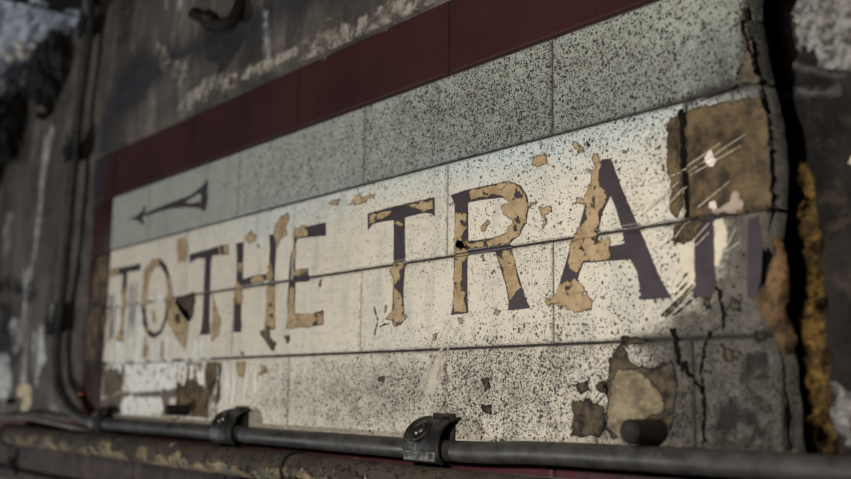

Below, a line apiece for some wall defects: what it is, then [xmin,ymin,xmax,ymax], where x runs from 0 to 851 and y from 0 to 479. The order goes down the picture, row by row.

spalling [739,15,765,85]
spalling [790,0,851,76]
peeling [666,96,778,246]
crack [669,0,840,455]
spalling [570,335,678,440]